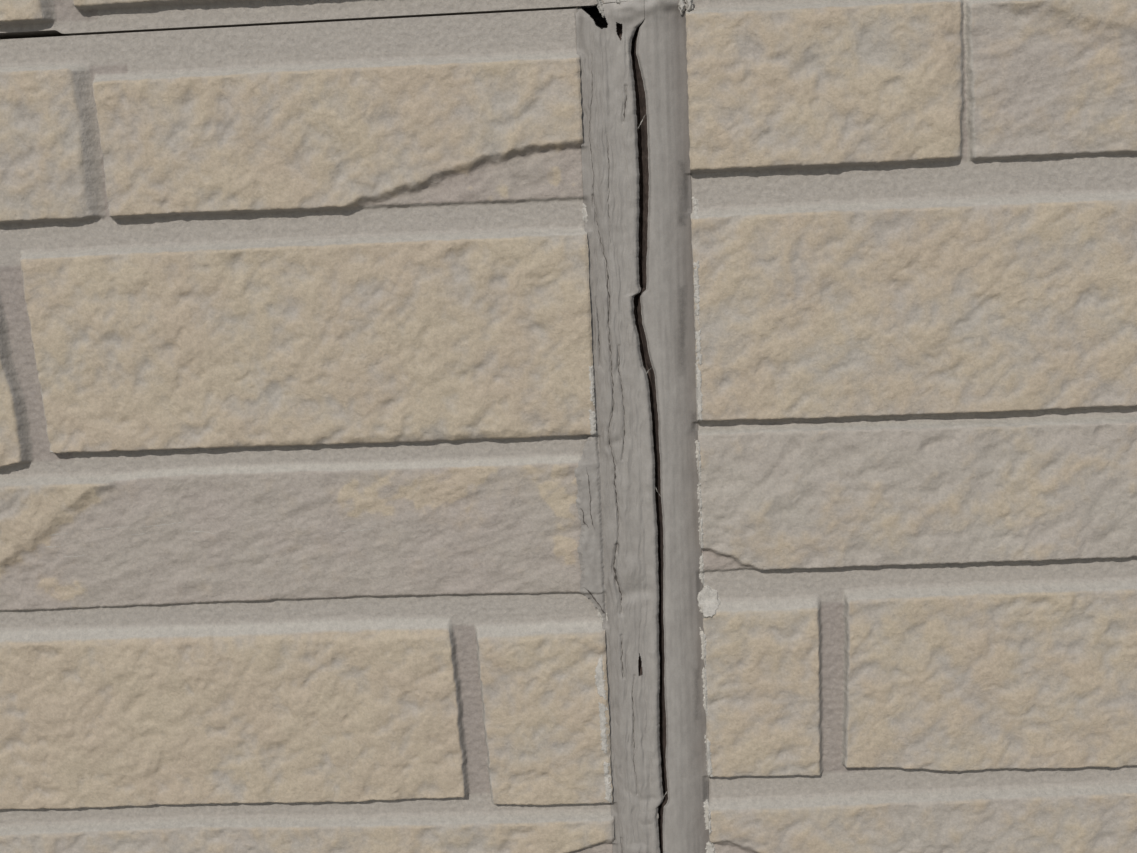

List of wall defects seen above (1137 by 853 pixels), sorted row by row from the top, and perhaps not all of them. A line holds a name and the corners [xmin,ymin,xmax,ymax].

crack [589,21,668,853]